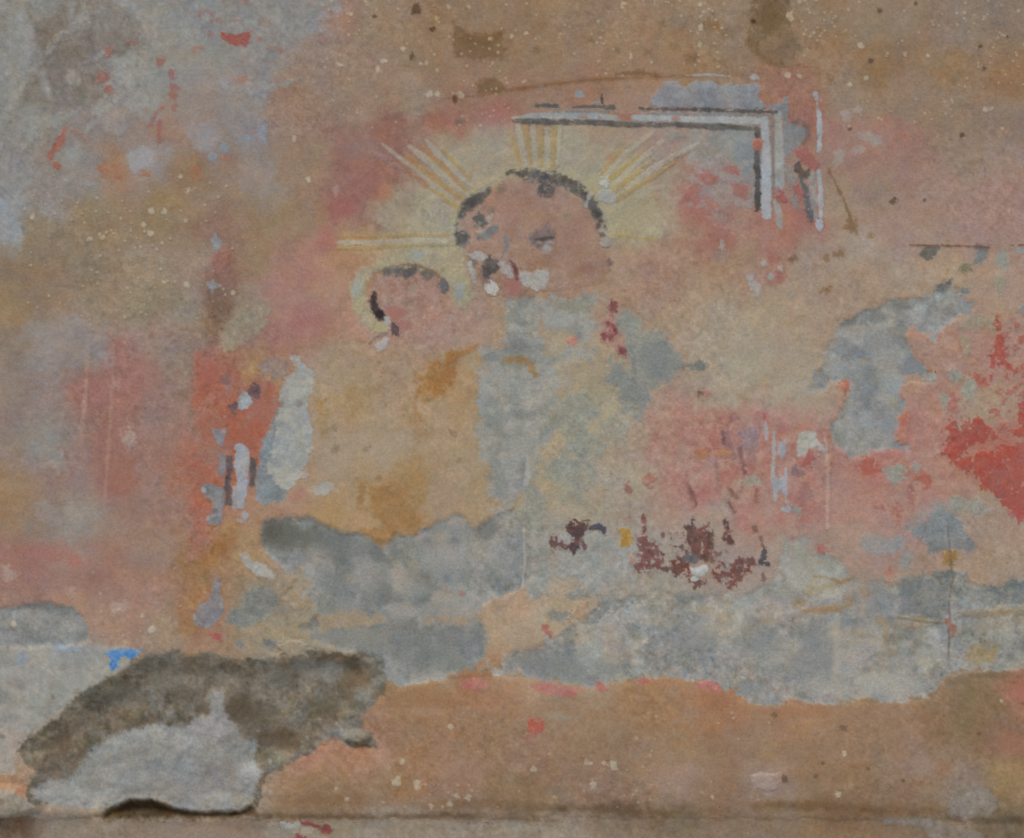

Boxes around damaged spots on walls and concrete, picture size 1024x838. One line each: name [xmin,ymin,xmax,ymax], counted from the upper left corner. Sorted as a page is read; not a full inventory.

flaking render [0,599,91,657]
spalling [17,238,1024,838]